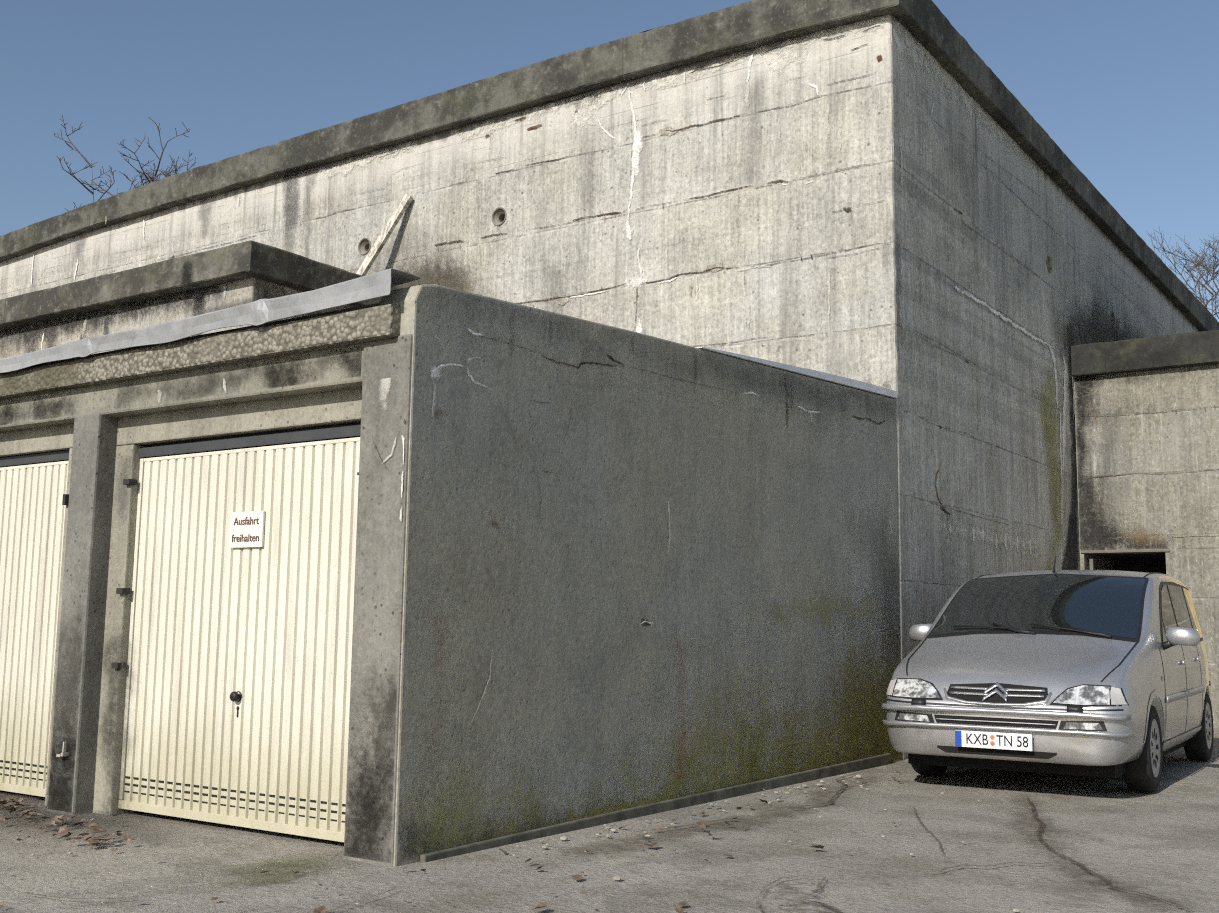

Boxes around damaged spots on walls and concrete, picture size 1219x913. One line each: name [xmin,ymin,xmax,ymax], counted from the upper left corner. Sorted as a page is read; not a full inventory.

crack [403,329,759,443]
water stain [955,286,1165,570]
water stain [344,682,396,860]
crack [1027,798,1194,912]